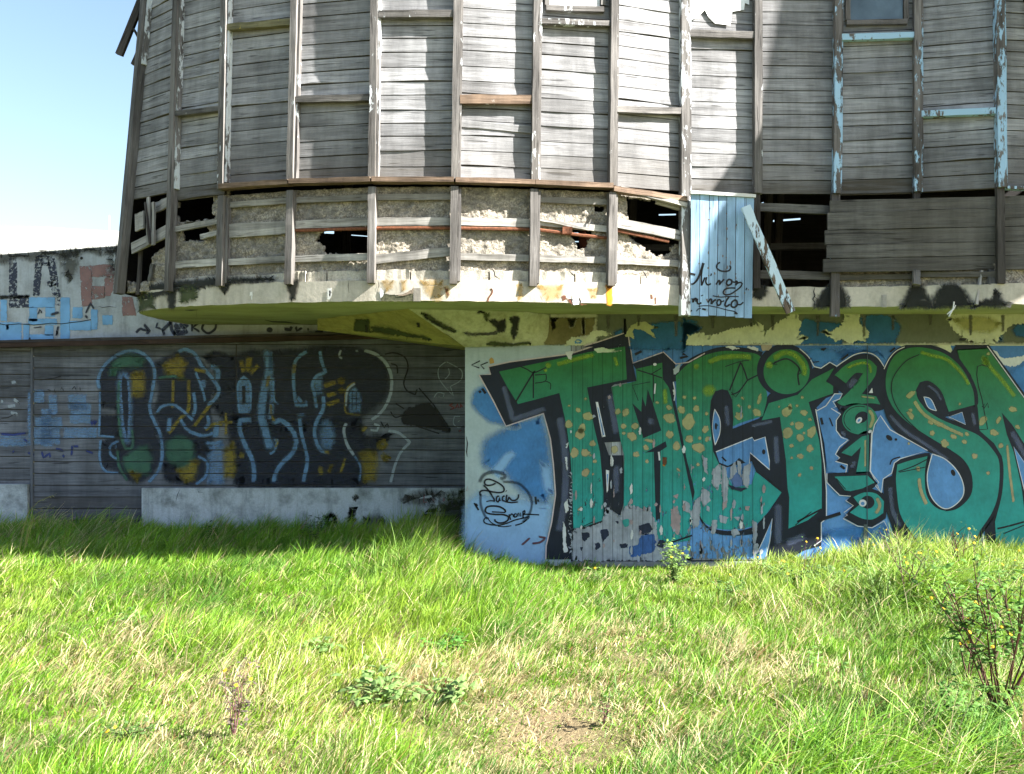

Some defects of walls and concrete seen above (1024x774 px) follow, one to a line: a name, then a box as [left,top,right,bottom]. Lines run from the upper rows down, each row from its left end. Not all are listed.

leakage [813,286,850,309]
leakage [899,284,1012,310]
peeling [625,321,659,339]
peeling [686,314,809,351]
peeling [821,314,870,343]
peeling [933,314,1024,367]
peeling [563,430,766,562]